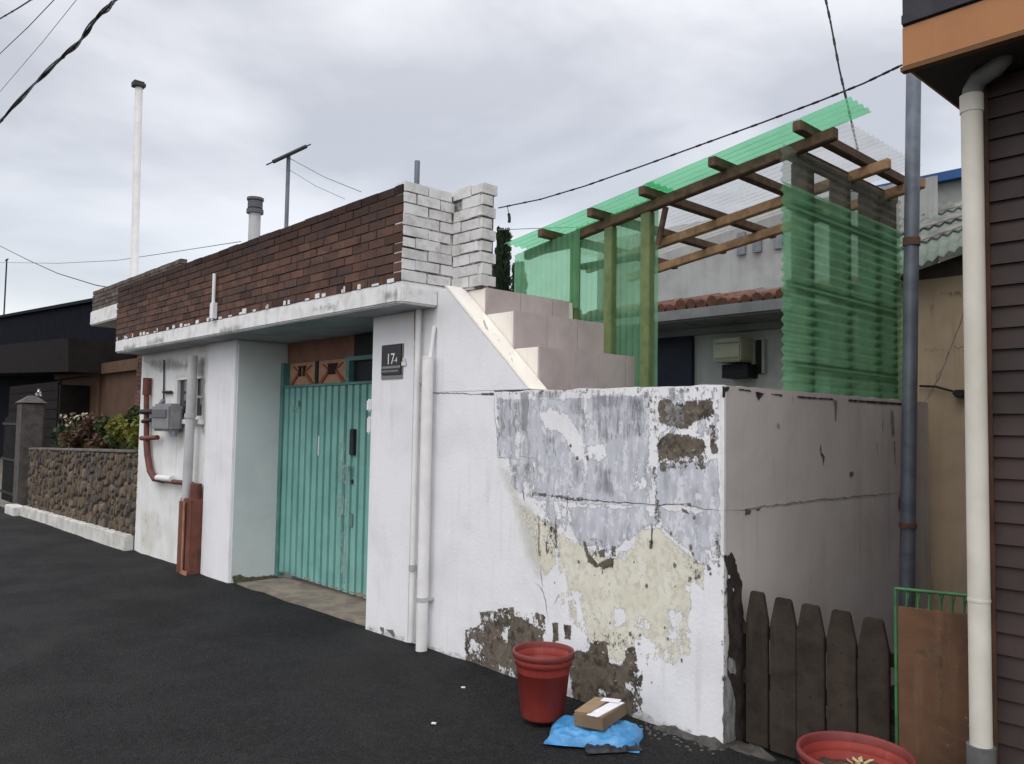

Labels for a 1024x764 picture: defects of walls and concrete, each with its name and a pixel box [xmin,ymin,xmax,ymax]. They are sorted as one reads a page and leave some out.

peeling [464,386,782,745]
crack [532,467,899,549]